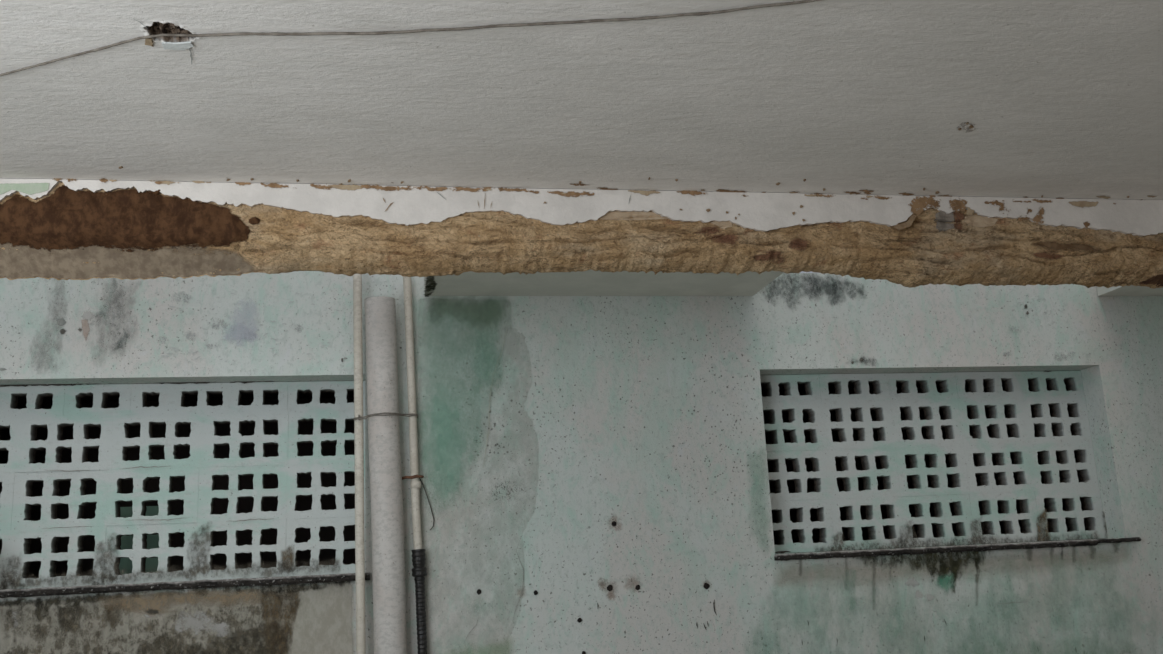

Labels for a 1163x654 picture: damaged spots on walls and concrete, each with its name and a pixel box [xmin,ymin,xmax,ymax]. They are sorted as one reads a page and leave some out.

spalling [0,166,1163,311]
damp [767,275,864,307]
damp [0,527,353,654]